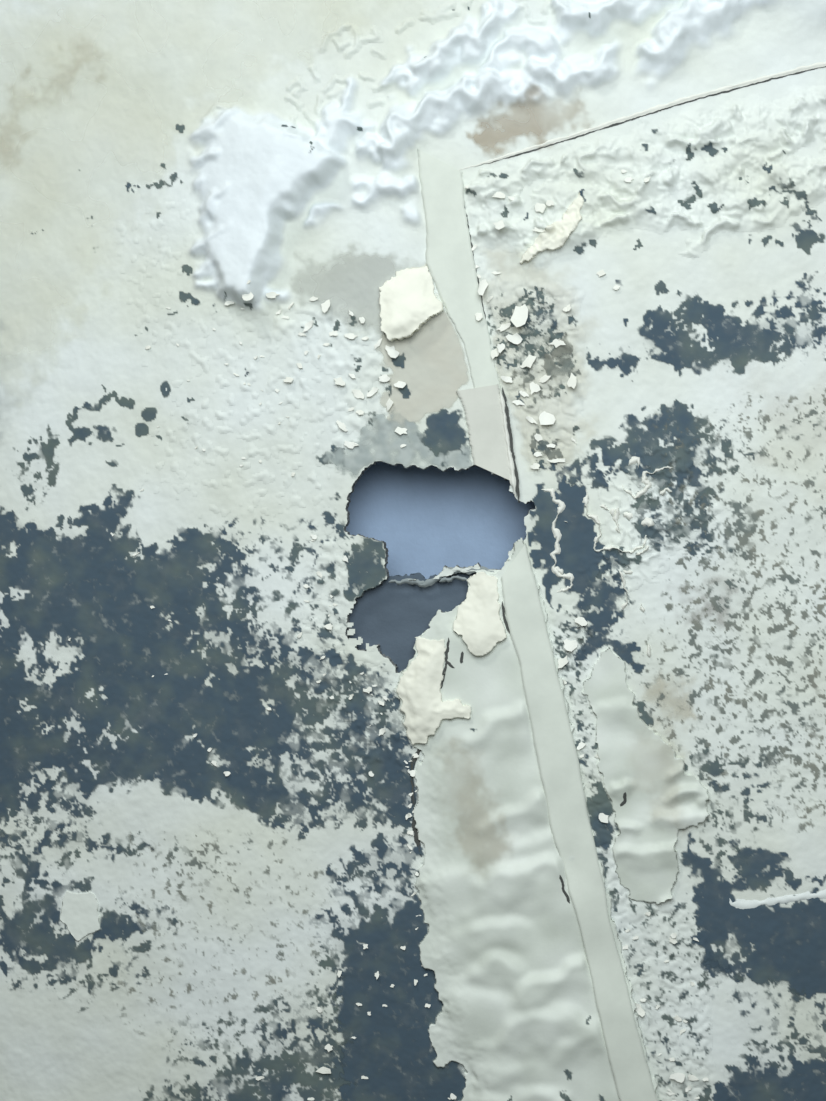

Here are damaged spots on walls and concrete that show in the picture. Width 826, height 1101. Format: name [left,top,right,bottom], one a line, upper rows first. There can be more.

crack [459,62,826,170]
crack [464,207,486,319]
damp [160,381,171,397]
damp [382,353,406,371]
flaking render [472,192,589,475]
damp [487,273,826,408]
damp [0,384,469,1101]
peeling [224,264,729,1101]
damp [528,390,826,1101]